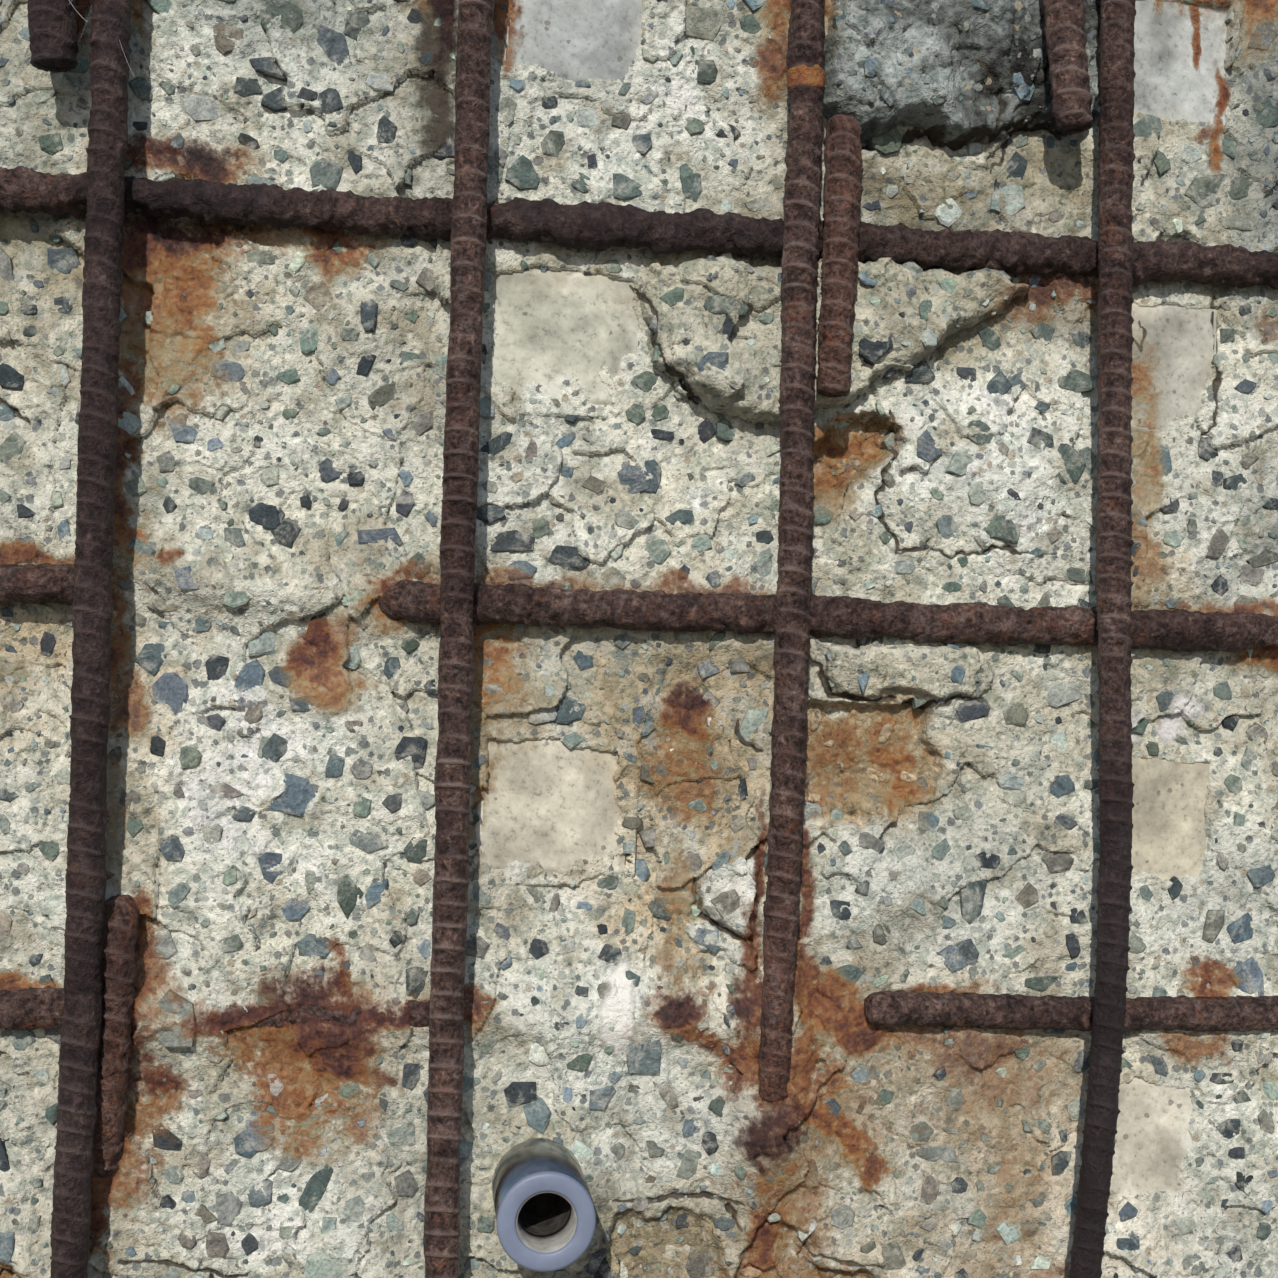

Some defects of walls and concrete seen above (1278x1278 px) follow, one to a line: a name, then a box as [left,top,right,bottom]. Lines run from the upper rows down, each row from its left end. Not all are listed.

spalling [224,56,438,198]
corrosion [108,213,247,737]
spalling [195,223,447,511]
crack [629,285,699,405]
crack [874,410,1029,559]
corrosion [89,891,187,1260]
corrosion [178,939,429,1157]
crack [691,877,748,942]
spalling [464,624,1052,1278]
corrosion [646,802,1027,1278]
crack [809,655,983,709]
spalling [803,643,1099,954]